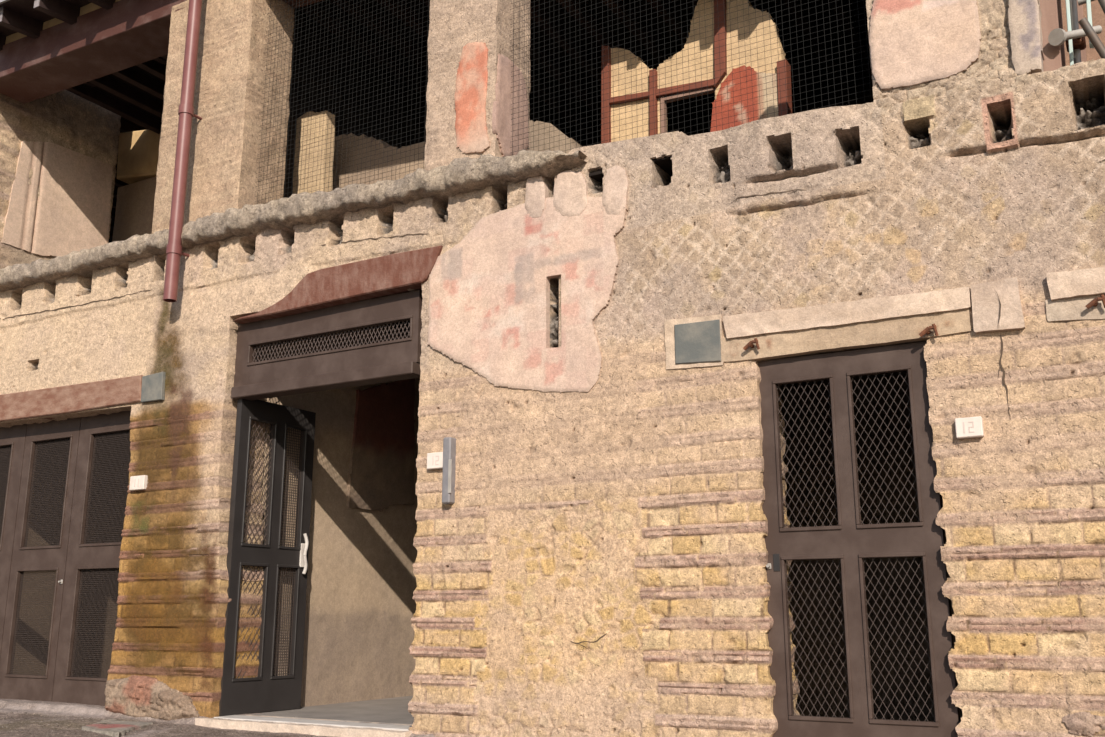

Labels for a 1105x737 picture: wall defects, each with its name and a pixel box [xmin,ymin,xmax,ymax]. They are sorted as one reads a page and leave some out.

leakage [126,302,213,665]
crack [996,292,1011,420]